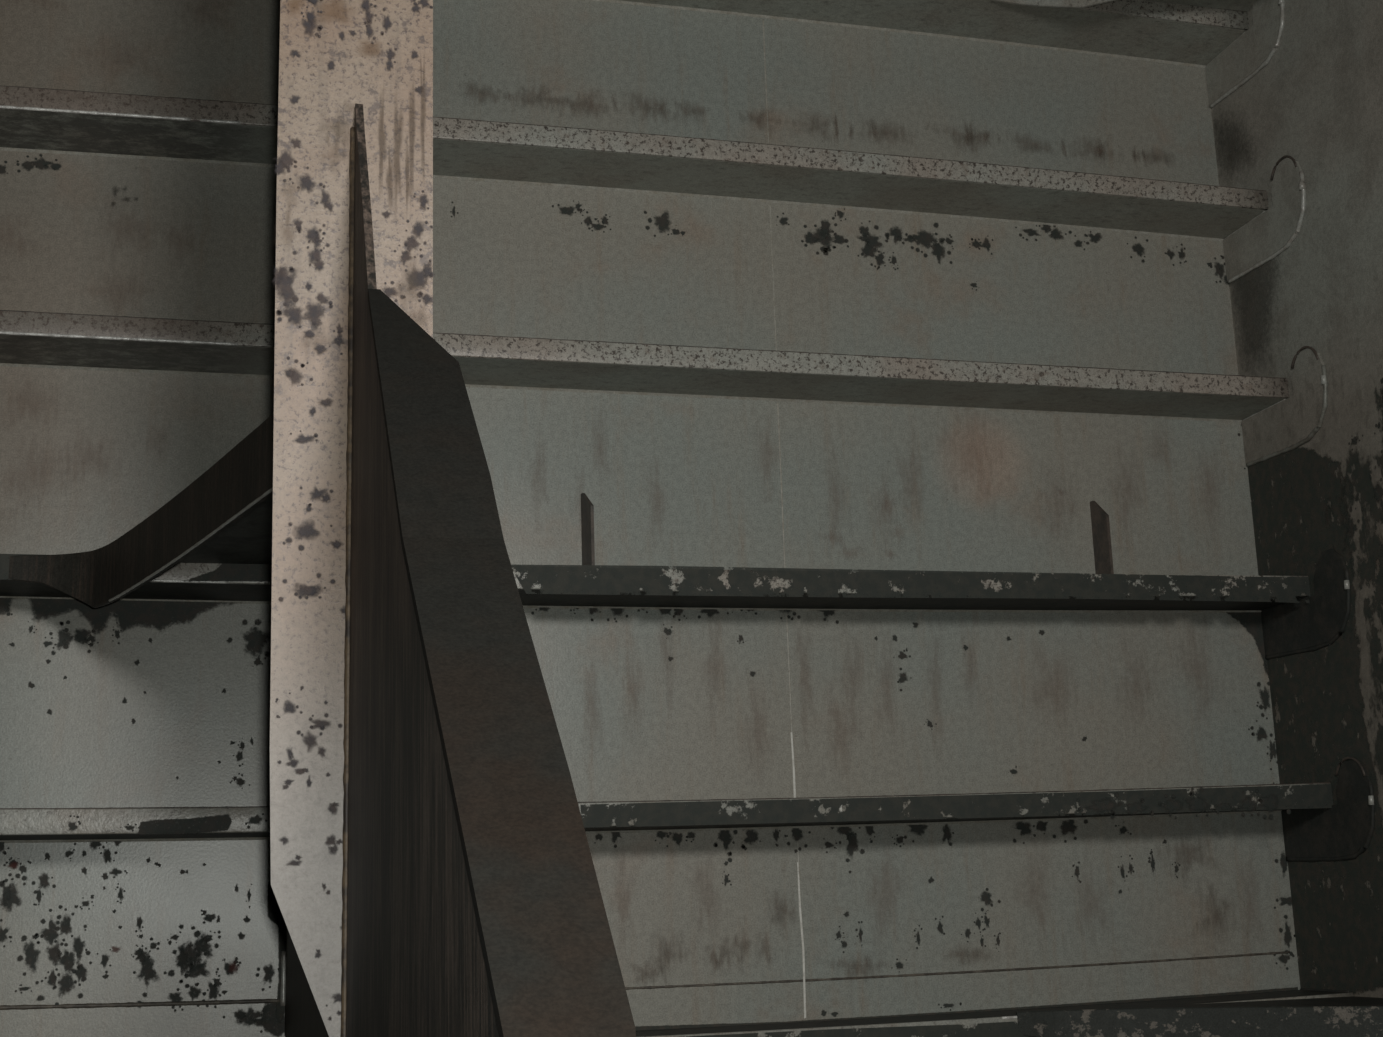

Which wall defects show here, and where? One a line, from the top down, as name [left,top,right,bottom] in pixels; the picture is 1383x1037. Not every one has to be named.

peeling [1326,441,1383,774]